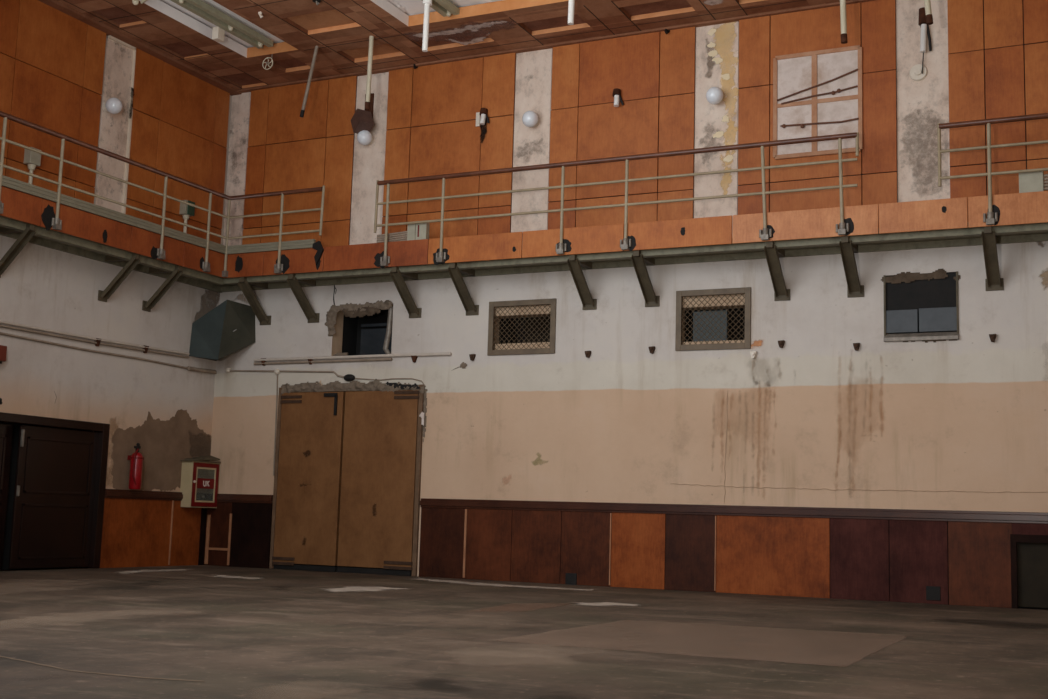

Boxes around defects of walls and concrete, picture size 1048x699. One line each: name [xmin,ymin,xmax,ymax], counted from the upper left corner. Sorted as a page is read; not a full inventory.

peeling [706,22,738,195]
flaking render [325,300,392,336]
flaking render [111,409,212,492]
flaking render [281,379,427,442]